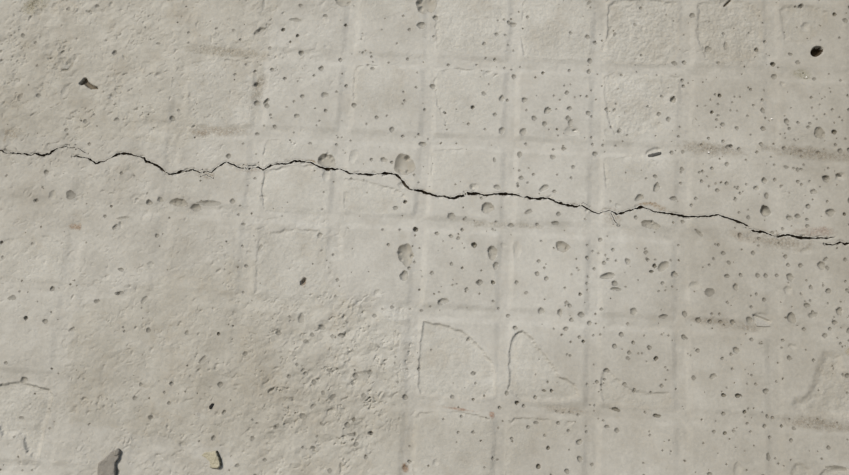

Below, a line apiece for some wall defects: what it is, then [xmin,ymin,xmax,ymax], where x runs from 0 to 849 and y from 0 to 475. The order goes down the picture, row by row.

crack [0,144,849,247]